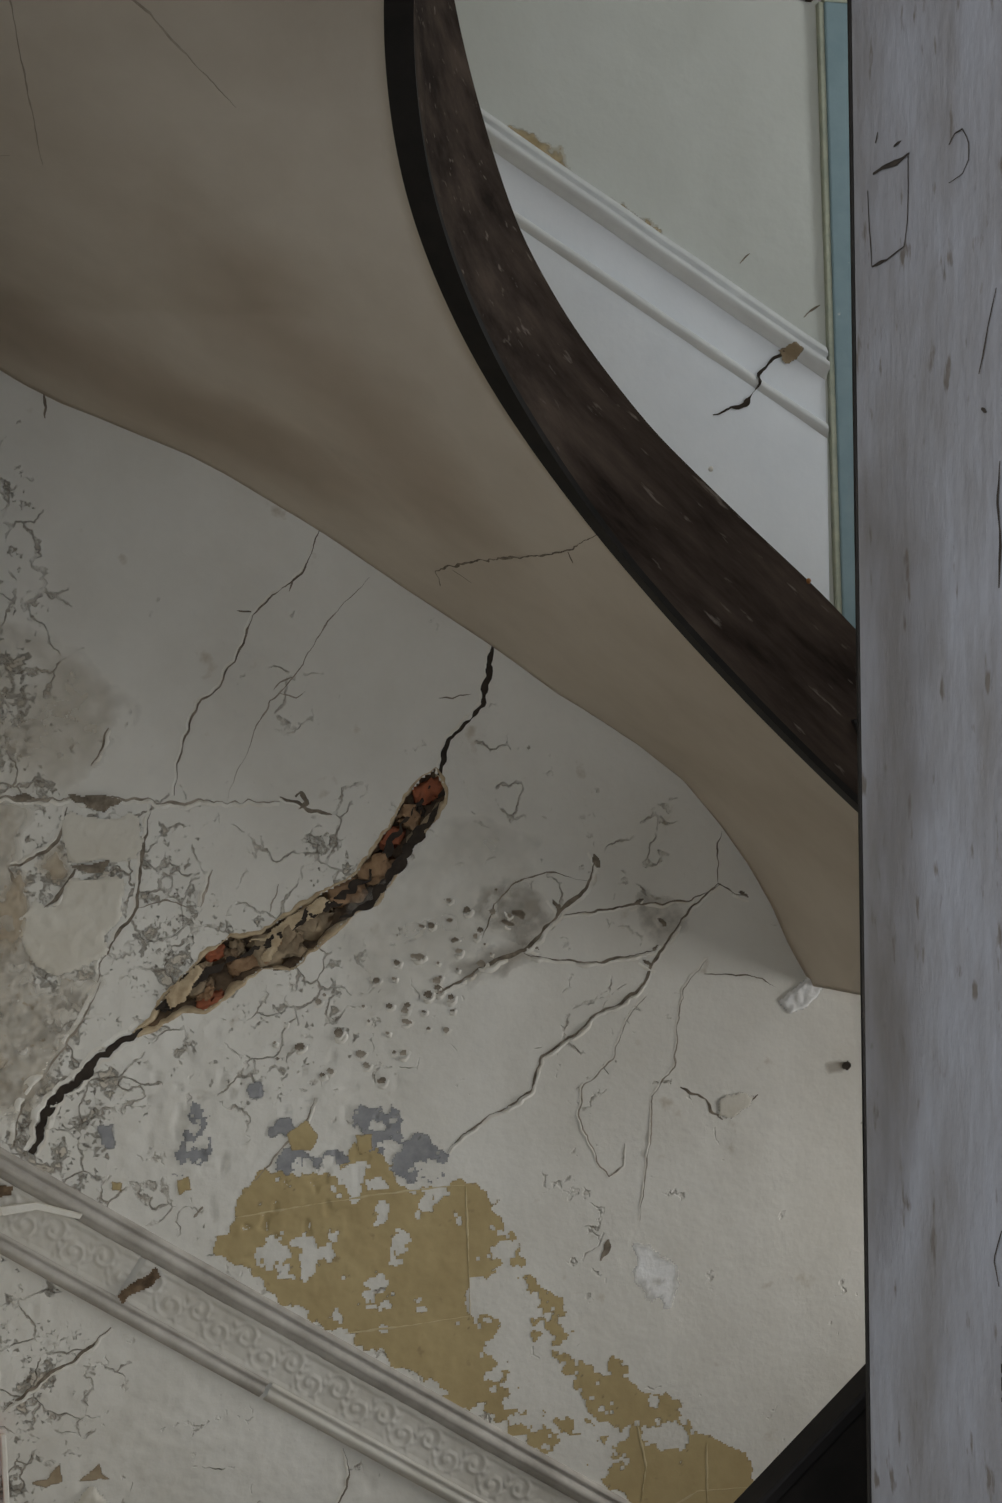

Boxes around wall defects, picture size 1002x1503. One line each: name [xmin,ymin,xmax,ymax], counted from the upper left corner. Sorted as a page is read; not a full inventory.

crack [713,350,785,415]
spalling [13,793,35,802]
peeling [17,794,144,976]
crack [0,530,494,1157]
flaking render [362,888,539,1062]
spalling [629,899,666,973]
crack [436,833,773,1261]
peeling [97,1124,116,1149]
peeling [174,1101,212,1195]
crack [255,1098,318,1181]
peeling [213,1022,758,1503]
spalling [0,1433,10,1503]